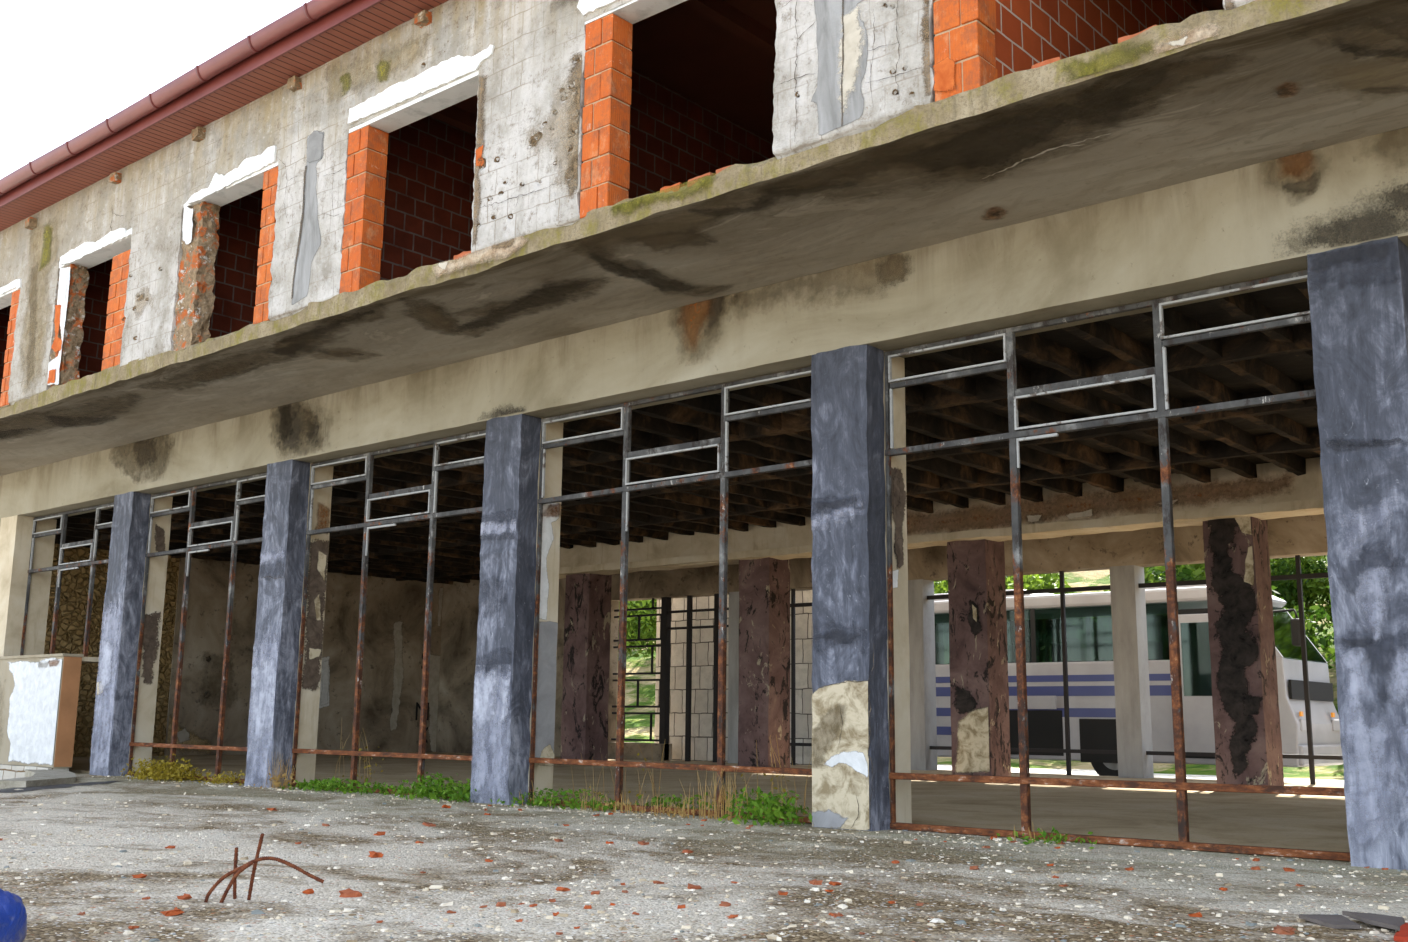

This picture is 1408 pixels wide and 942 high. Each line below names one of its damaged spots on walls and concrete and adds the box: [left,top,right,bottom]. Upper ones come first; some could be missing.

damp [340,73,350,94]
damp [377,61,389,82]
damp [637,56,1233,251]
rust [1281,152,1318,193]
peeling [182,206,193,244]
damp [1289,184,1408,252]
damp [31,225,52,324]
damp [401,236,728,337]
damp [0,304,383,440]
damp [276,404,319,452]
damp [114,435,171,482]